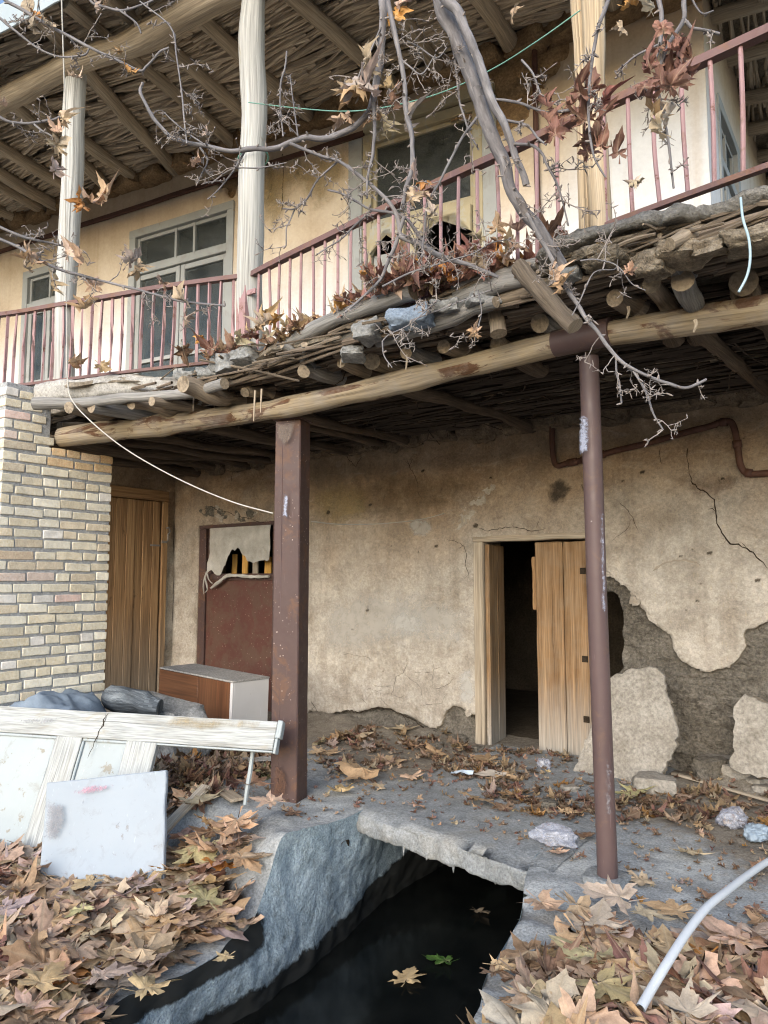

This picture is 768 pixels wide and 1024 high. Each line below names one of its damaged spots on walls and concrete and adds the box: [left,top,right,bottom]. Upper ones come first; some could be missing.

crack [686,449,767,568]
spalling [334,706,475,742]
spalling [606,571,768,771]